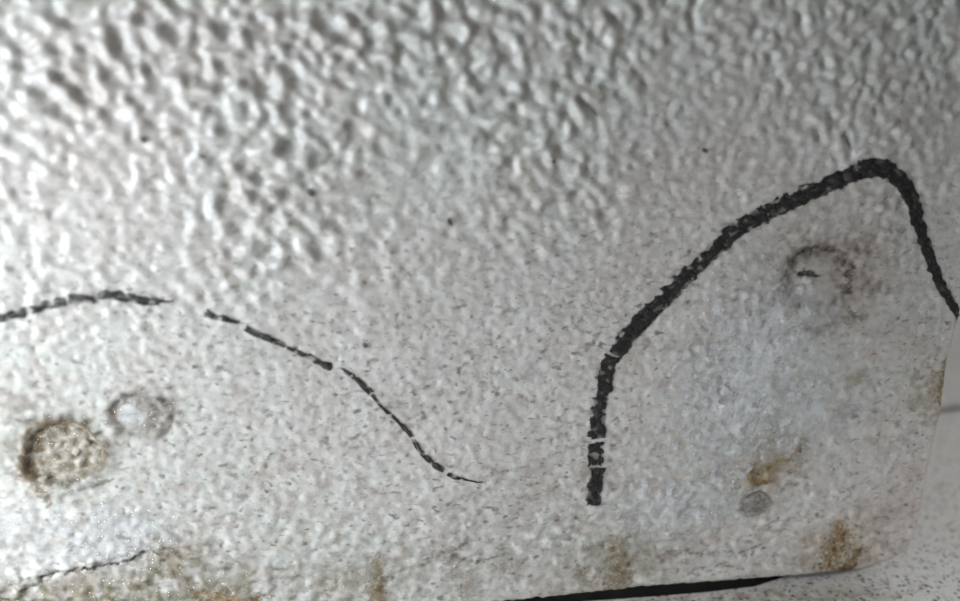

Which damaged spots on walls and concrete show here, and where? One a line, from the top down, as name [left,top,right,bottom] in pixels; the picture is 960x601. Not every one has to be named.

rust [814,525,865,573]